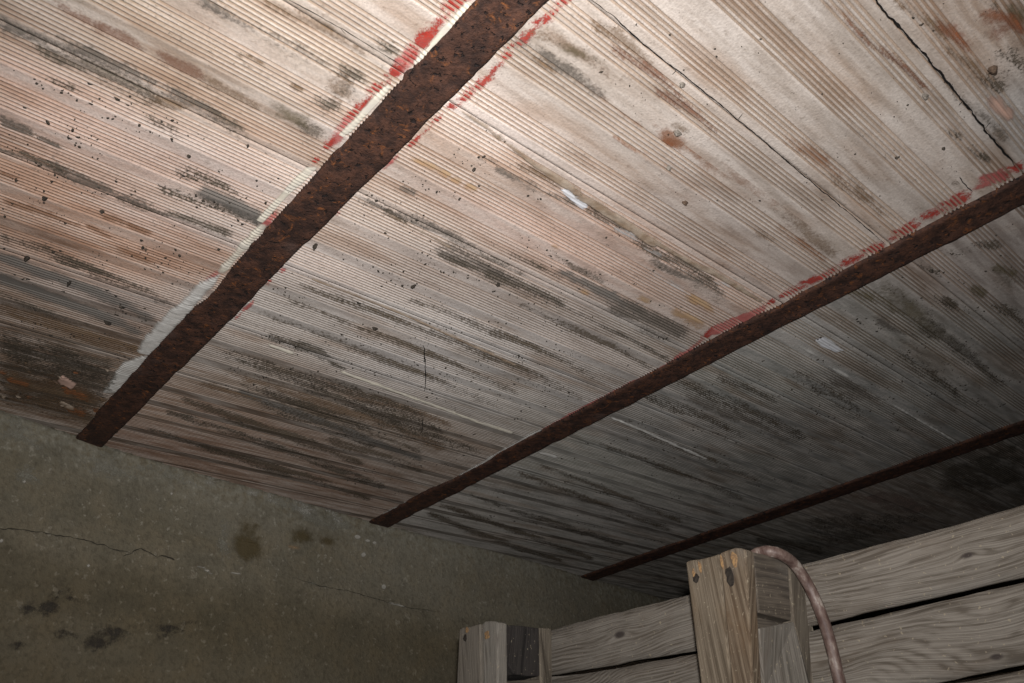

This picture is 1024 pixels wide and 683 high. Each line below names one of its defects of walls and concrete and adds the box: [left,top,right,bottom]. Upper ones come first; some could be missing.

corrosion [68,12,138,47]
corrosion [162,54,242,101]
crack [876,0,1015,166]
corrosion [663,128,684,147]
crack [592,0,884,243]
corrosion [799,147,882,213]
corrosion [9,202,110,237]
leakage [0,235,153,367]
leakage [604,265,1024,507]
crack [0,528,175,560]
leakage [428,465,682,561]